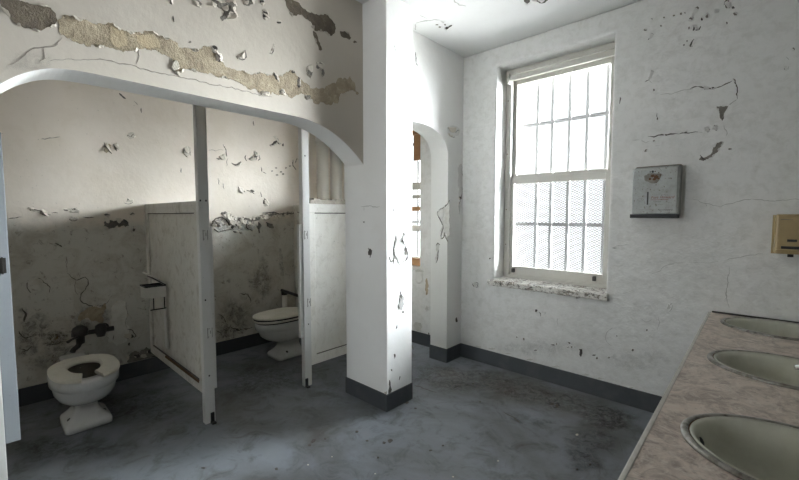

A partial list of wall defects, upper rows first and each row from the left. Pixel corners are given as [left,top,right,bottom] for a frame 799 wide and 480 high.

peeling [660,0,738,47]
spalling [0,0,359,106]
crack [660,79,738,105]
crack [641,131,702,143]
peeling [214,145,297,176]
peeling [103,198,135,232]
peeling [211,186,294,234]
peeling [435,164,463,262]
peeling [389,232,409,266]
water stain [78,300,130,346]